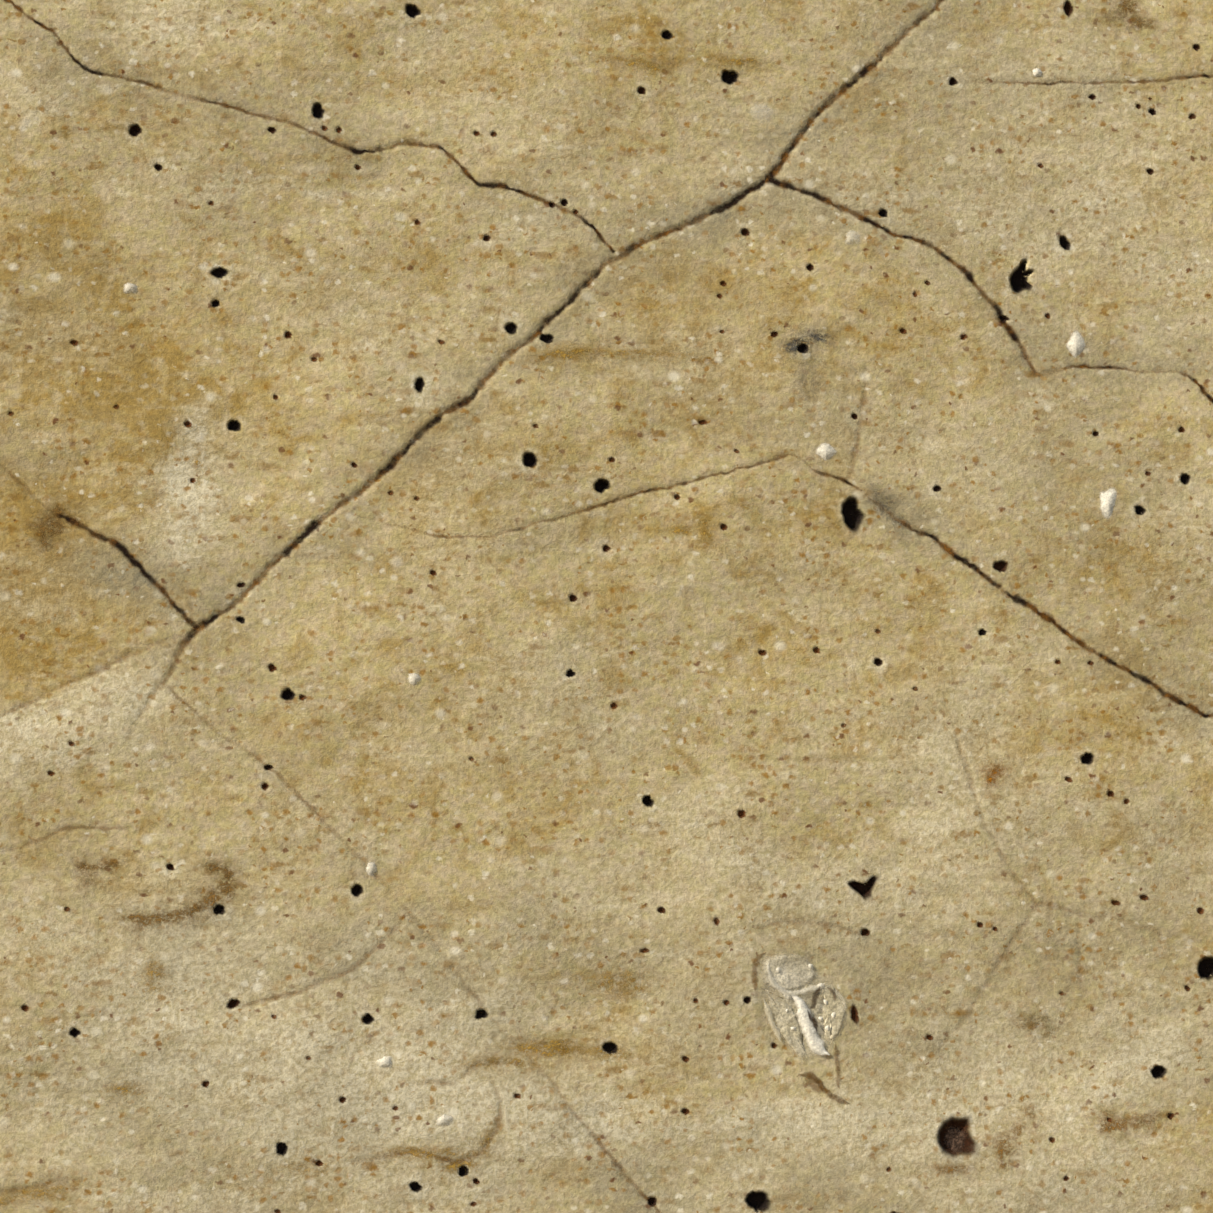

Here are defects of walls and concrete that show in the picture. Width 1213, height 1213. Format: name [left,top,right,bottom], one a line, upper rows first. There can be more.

crack [4,0,158,88]
crack [1032,74,1213,85]
crack [58,0,1036,651]
crack [1070,363,1126,371]
crack [1188,376,1213,403]
crack [901,521,1213,718]
spalling [764,956,844,1055]